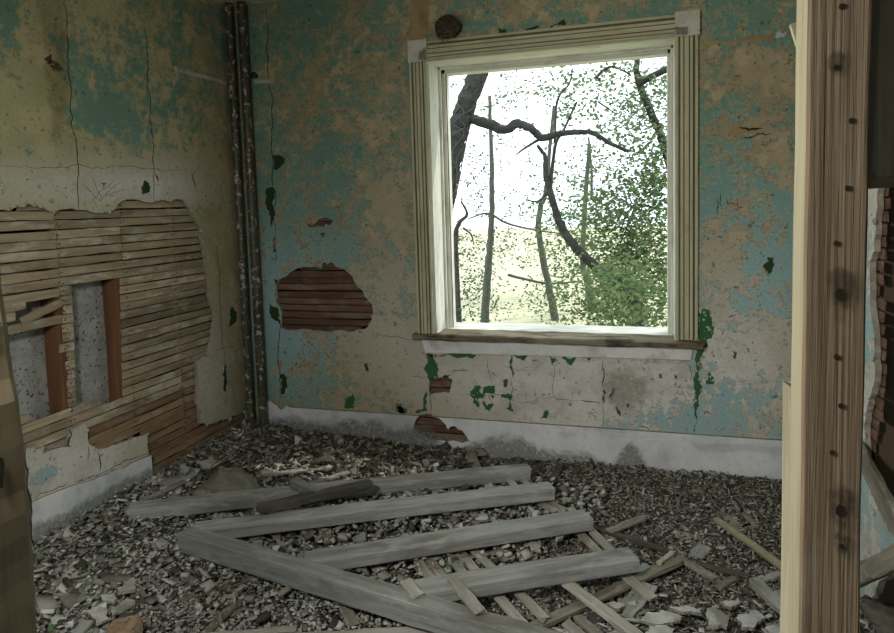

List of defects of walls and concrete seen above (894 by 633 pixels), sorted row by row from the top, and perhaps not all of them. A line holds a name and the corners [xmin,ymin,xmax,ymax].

crack [2,3,195,210]
peeling [265,186,276,252]
flaking render [0,180,247,472]
flaking render [269,263,374,332]
peeling [344,394,356,410]
flaking render [395,353,477,441]
crack [415,360,620,424]
peeling [549,356,592,366]
peeling [692,308,715,432]
flaking render [863,187,894,497]
crack [40,430,149,494]
flaking render [870,578,894,604]